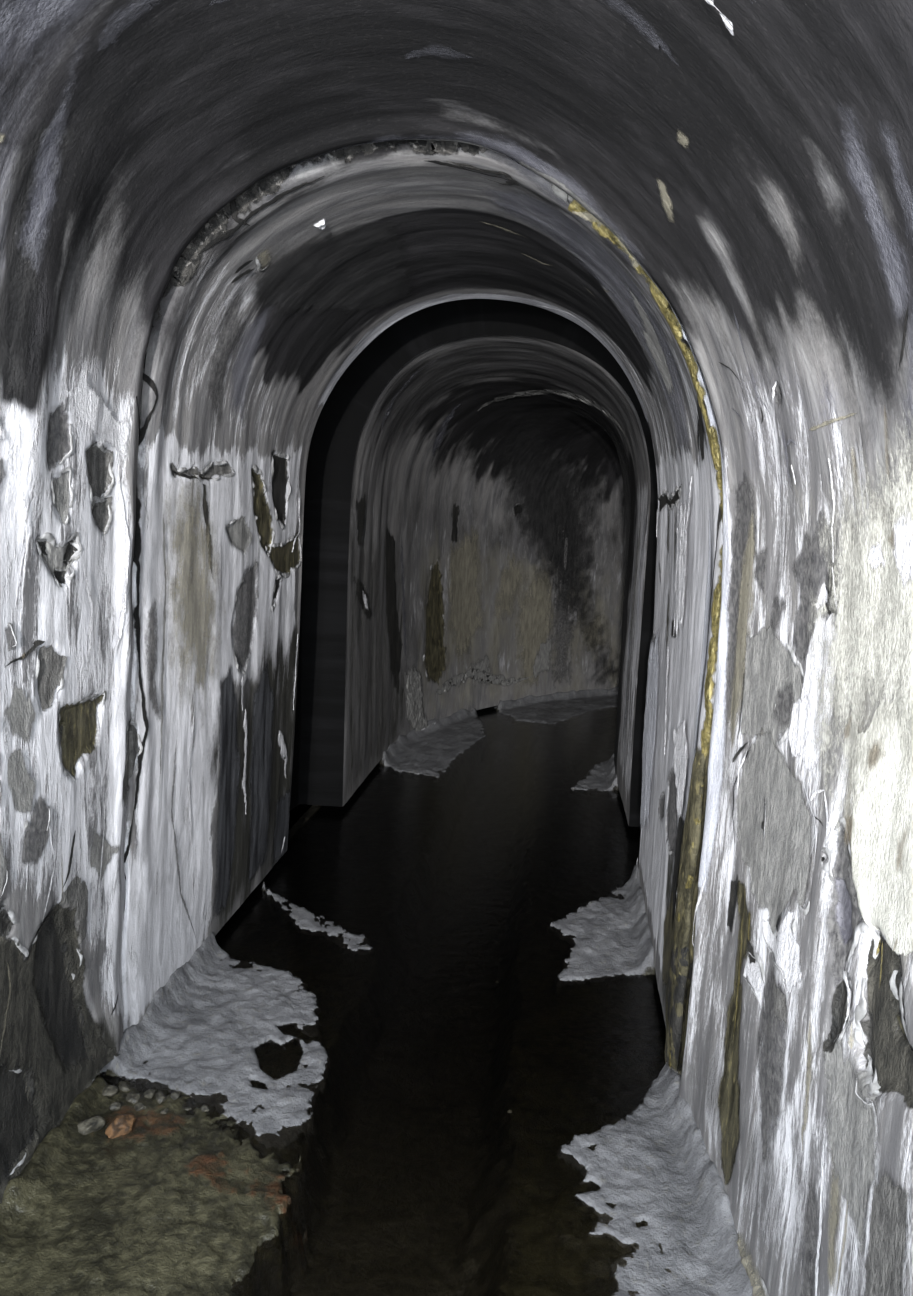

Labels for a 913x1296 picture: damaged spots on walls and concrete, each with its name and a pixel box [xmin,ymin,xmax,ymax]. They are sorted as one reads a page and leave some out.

water stain [0,110,75,406]
spalling [5,622,17,652]
spalling [36,404,115,587]
water stain [66,369,129,456]
flaking render [171,460,235,481]
water stain [146,488,291,937]
flaking render [226,450,302,675]
water stain [293,138,837,984]
water stain [868,514,913,585]
spalling [0,645,120,1204]
water stain [42,797,119,944]
flaking render [736,436,913,1254]